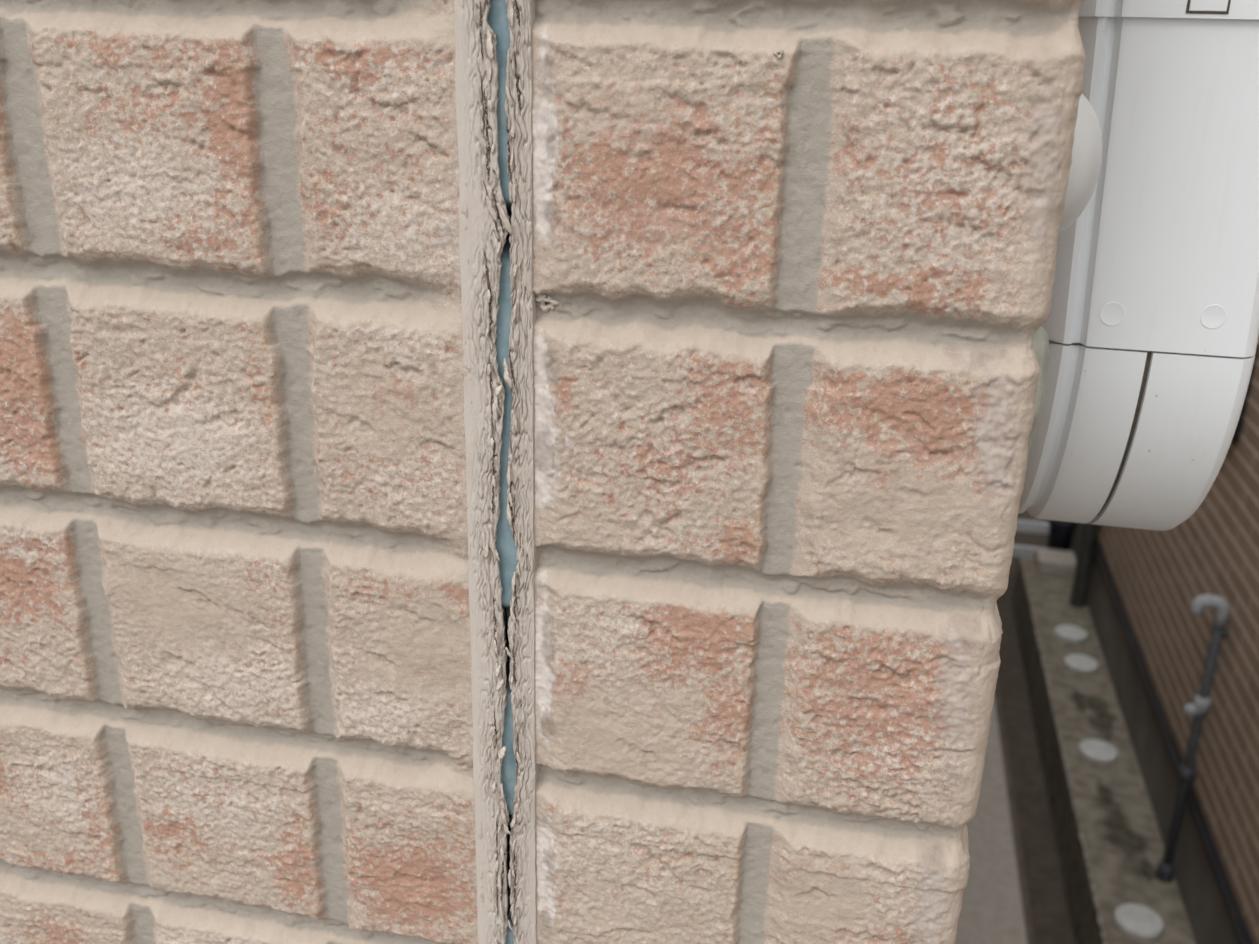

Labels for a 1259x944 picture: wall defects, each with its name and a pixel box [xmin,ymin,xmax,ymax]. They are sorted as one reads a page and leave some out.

crack [479,0,521,944]